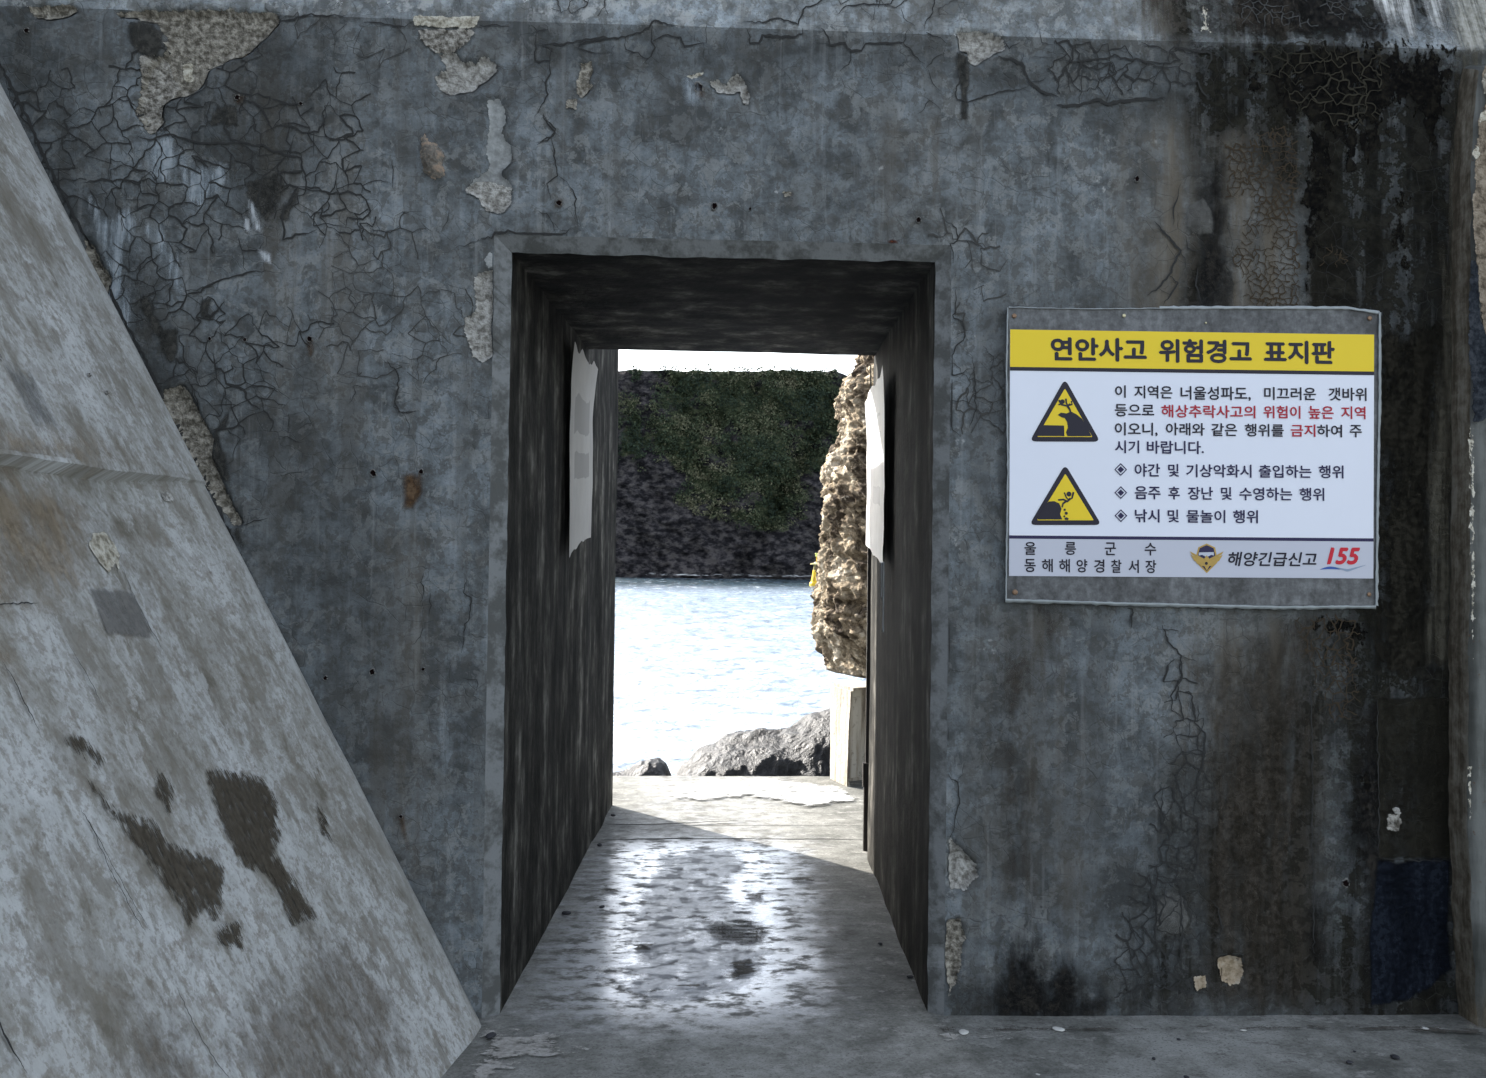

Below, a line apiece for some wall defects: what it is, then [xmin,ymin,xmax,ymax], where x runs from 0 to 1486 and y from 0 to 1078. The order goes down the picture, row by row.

spalling [117,7,279,134]
crack [8,0,707,476]
spalling [413,15,513,214]
crack [928,208,1008,434]
crack [746,0,1213,113]
water stain [1197,181,1233,306]
crack [1148,0,1390,306]
water stain [1238,0,1486,675]
peeling [1472,66,1486,332]
water stain [65,734,317,950]
water stain [317,803,332,842]
spalling [1194,955,1244,991]